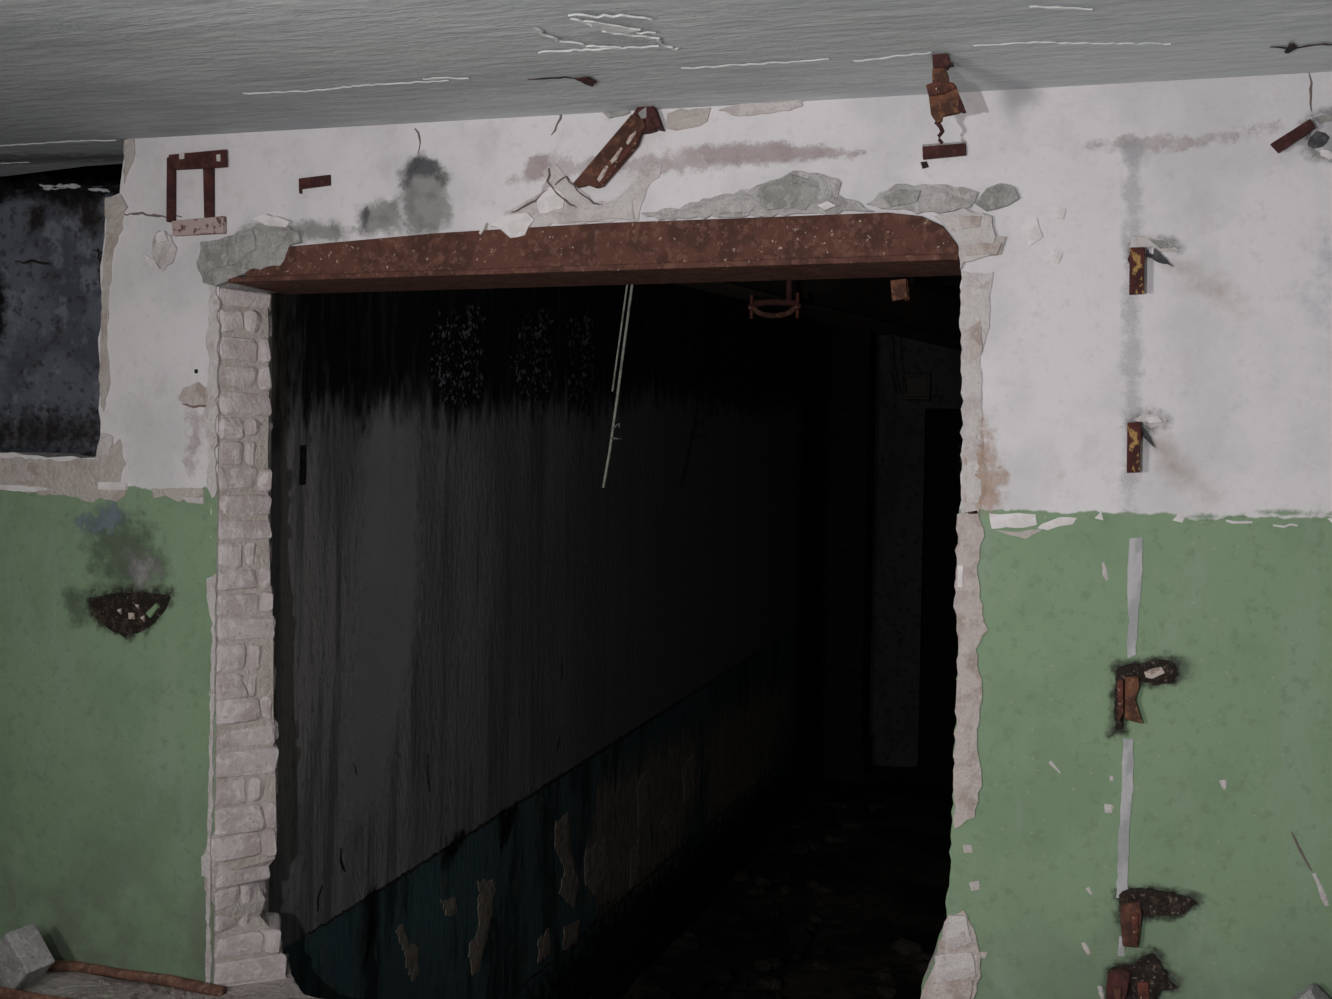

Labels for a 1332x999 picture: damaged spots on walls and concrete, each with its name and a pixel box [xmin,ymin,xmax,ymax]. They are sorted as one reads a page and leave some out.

spalling [666,100,803,131]
water stain [360,156,451,233]
peeling [490,162,662,238]
spalling [935,209,1077,829]
peeling [117,603,159,622]
spalling [920,910,988,999]